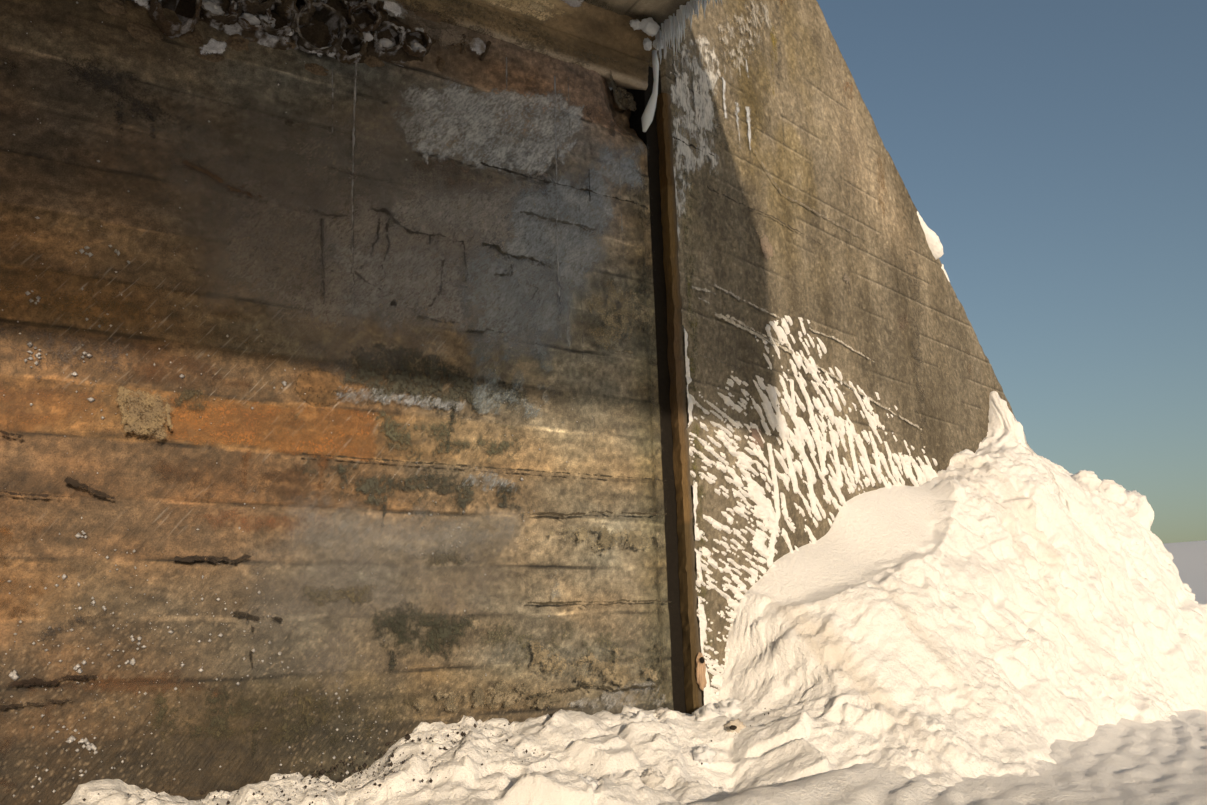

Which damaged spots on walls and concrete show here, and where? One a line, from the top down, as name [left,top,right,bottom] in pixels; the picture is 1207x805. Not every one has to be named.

crack [313,166,551,334]